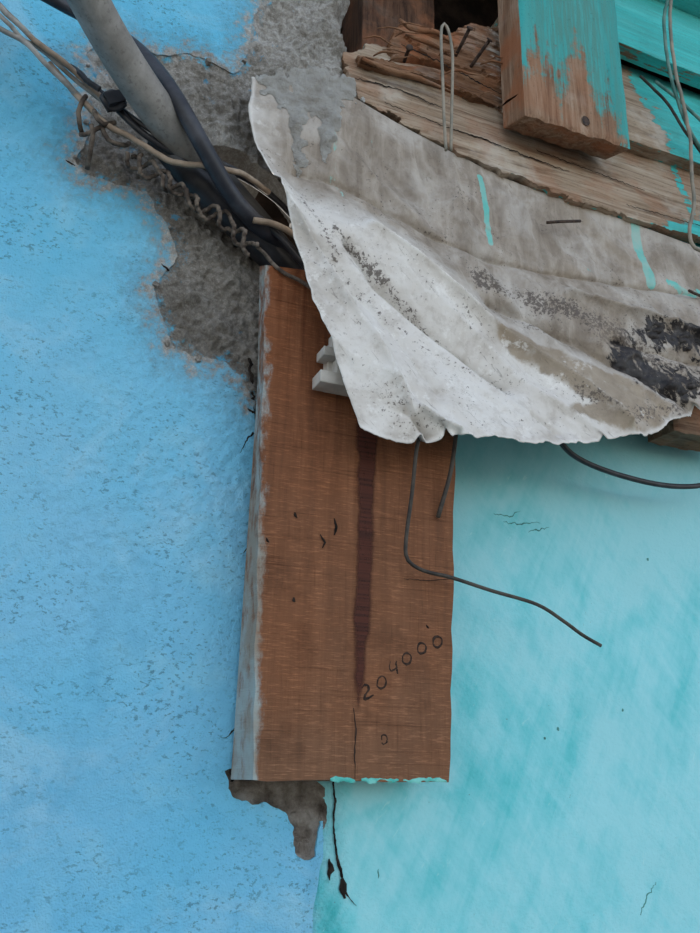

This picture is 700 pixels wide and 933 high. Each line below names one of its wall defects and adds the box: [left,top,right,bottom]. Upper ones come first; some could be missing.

spalling [154,0,350,229]
spalling [66,49,260,416]
spalling [225,769,327,860]
crack [327,782,354,903]